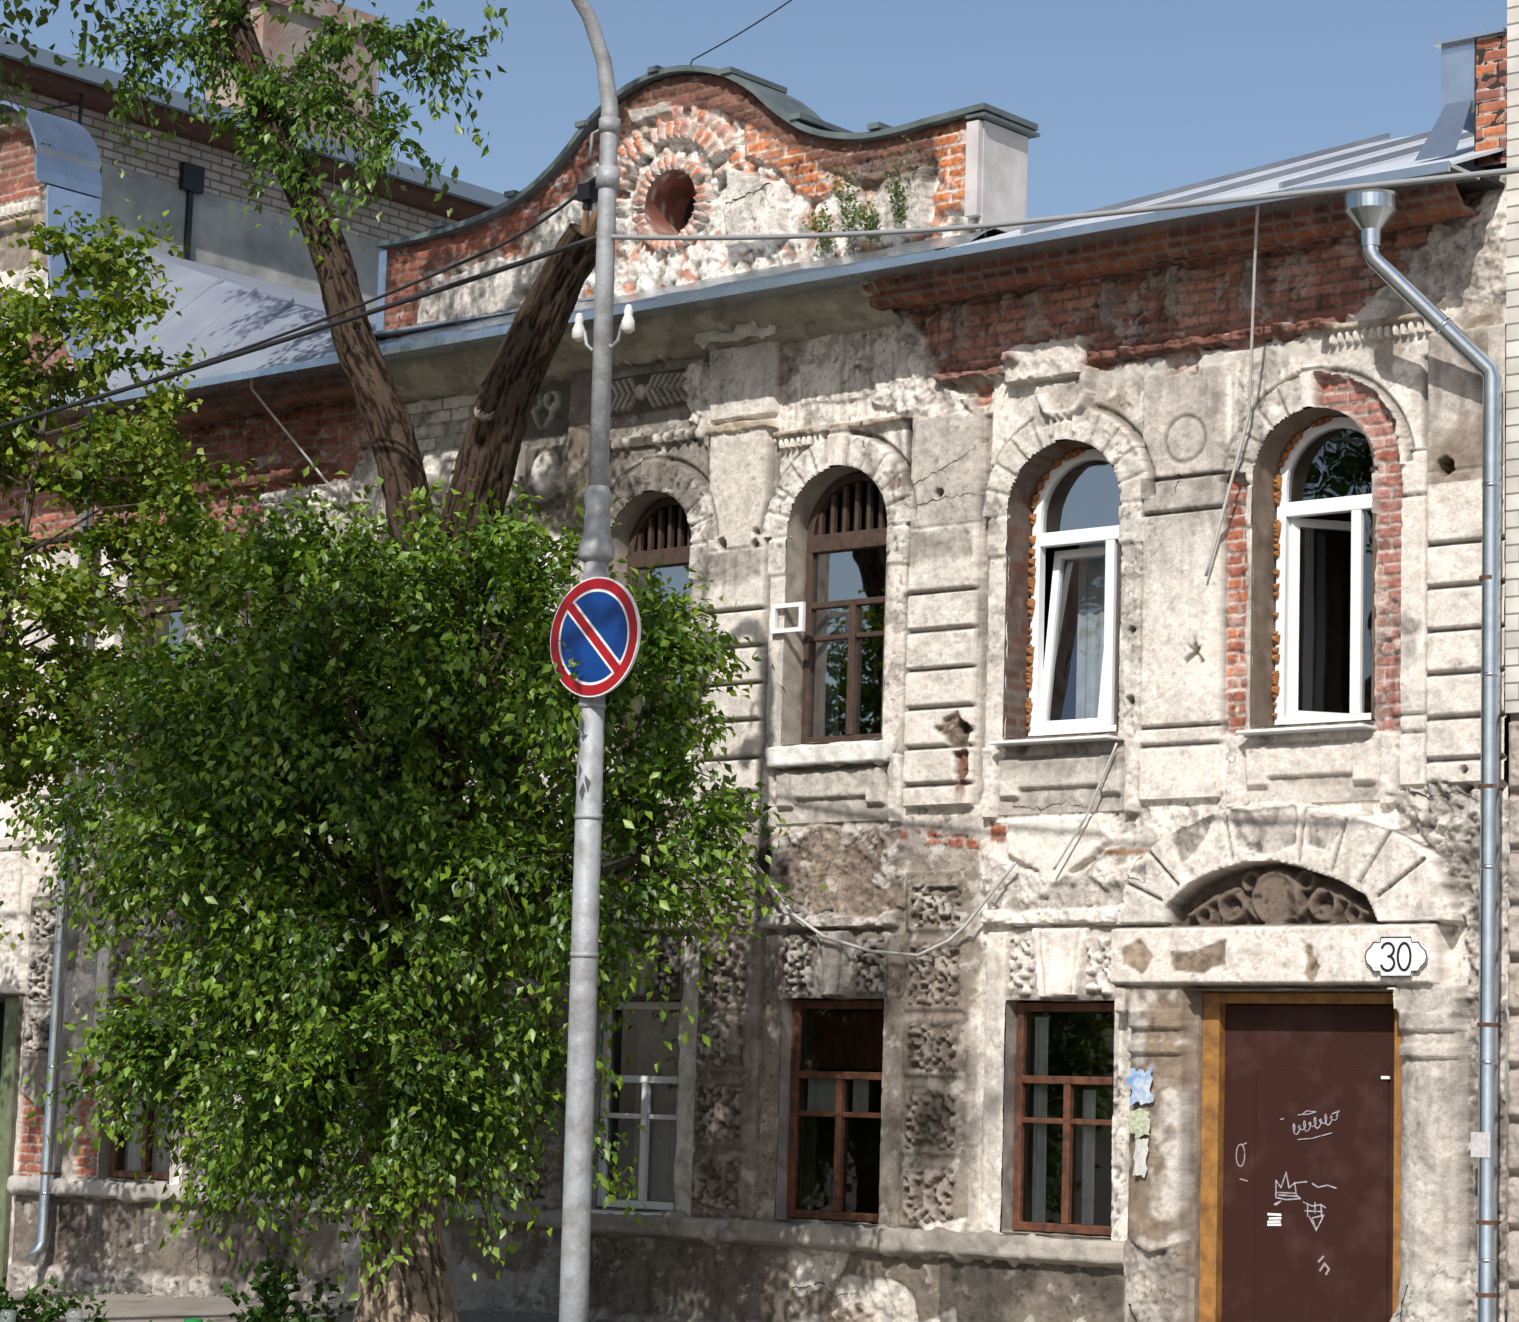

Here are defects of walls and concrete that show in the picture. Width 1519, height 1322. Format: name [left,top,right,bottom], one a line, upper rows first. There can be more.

flaking render [800,191,1506,418]
flaking render [1227,471,1249,733]
flaking render [1315,371,1404,732]
corrosion [957,752,969,789]